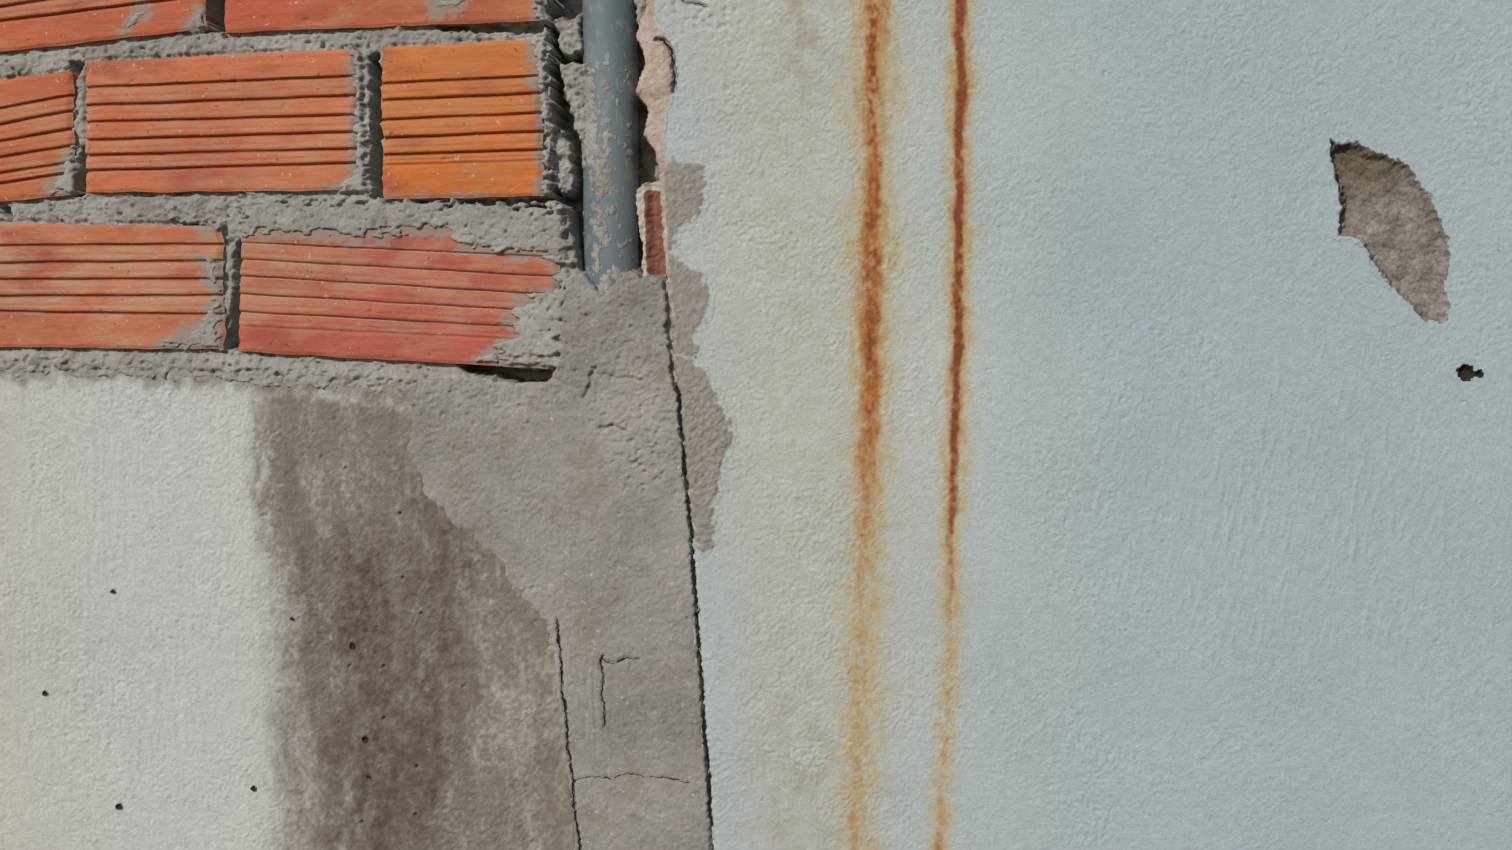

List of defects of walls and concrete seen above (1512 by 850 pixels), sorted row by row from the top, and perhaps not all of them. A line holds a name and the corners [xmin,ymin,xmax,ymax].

damp [230,375,575,850]
crack [556,382,714,850]
corrosion [804,0,994,850]
spalling [1324,135,1451,324]
spalling [1456,364,1484,381]